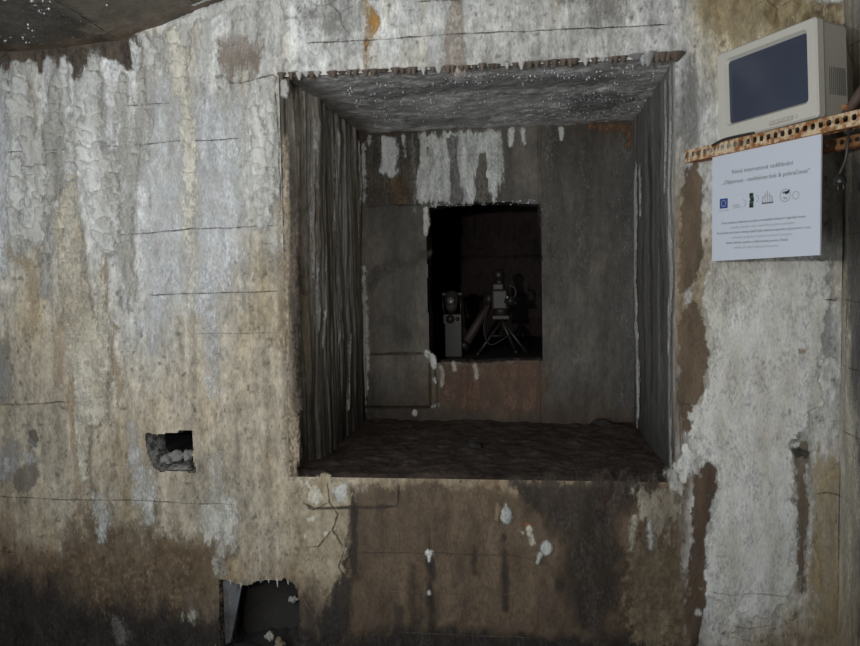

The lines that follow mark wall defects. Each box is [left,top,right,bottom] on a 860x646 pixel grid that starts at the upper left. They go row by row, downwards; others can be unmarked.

leakage [167,0,288,89]
corrosion [363,0,380,73]
leakage [347,0,640,114]
leakage [134,72,245,399]
leakage [275,94,352,480]
leakage [292,54,860,646]
spalling [677,162,709,434]
leakage [0,422,241,646]
spalling [146,430,196,473]
spalling [219,578,301,646]
crack [304,482,449,576]
spalling [684,461,718,646]